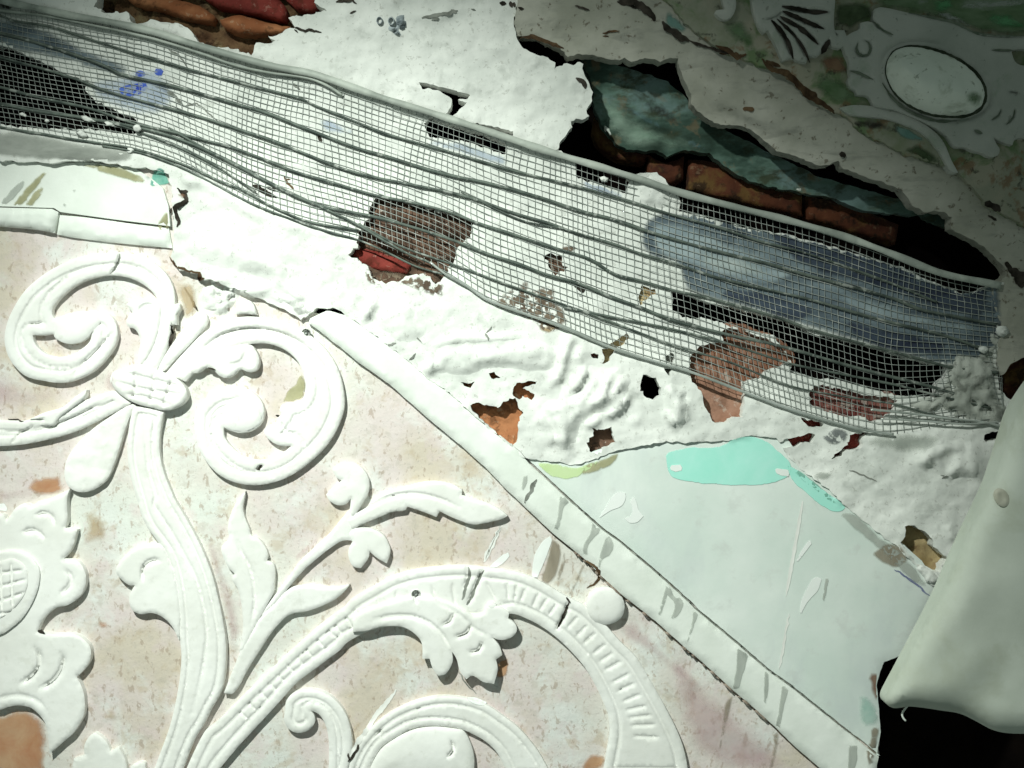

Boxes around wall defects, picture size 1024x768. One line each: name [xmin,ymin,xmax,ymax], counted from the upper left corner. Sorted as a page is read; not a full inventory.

flaking render [102,0,321,55]
spalling [559,103,1000,288]
flaking render [350,198,473,284]
flaking render [544,254,568,276]
flaking render [688,322,795,422]
flaking render [471,381,536,444]
flaking render [587,428,615,452]
flaking render [809,385,896,421]
flaking render [901,525,942,584]